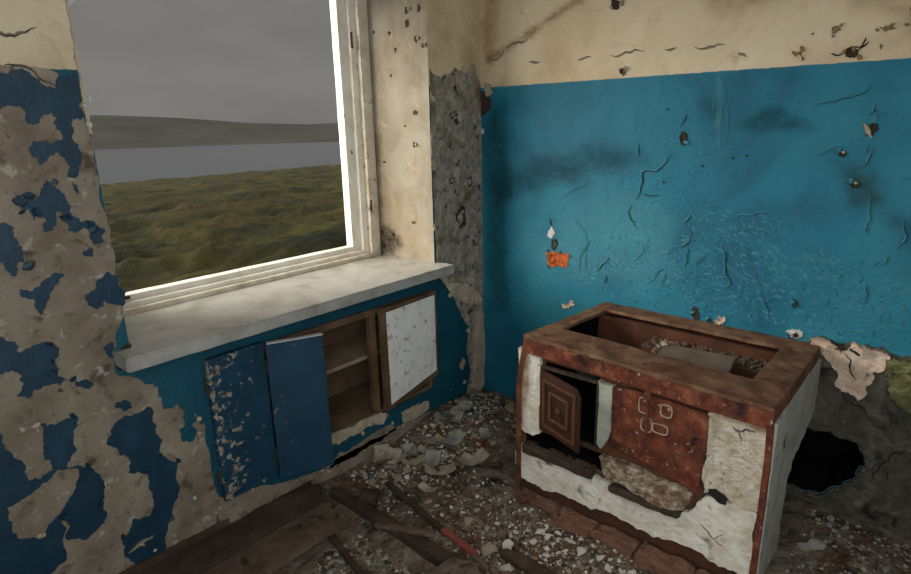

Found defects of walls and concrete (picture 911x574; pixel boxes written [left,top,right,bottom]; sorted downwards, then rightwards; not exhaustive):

crack [0,27,36,37]
crack [4,63,56,87]
crack [814,85,876,113]
spalling [831,38,869,60]
crack [627,144,669,227]
peeling [0,0,433,574]
peeling [429,64,493,394]
flaking render [546,219,570,268]
crack [574,219,609,283]
crack [651,212,774,321]
spalling [785,329,911,538]